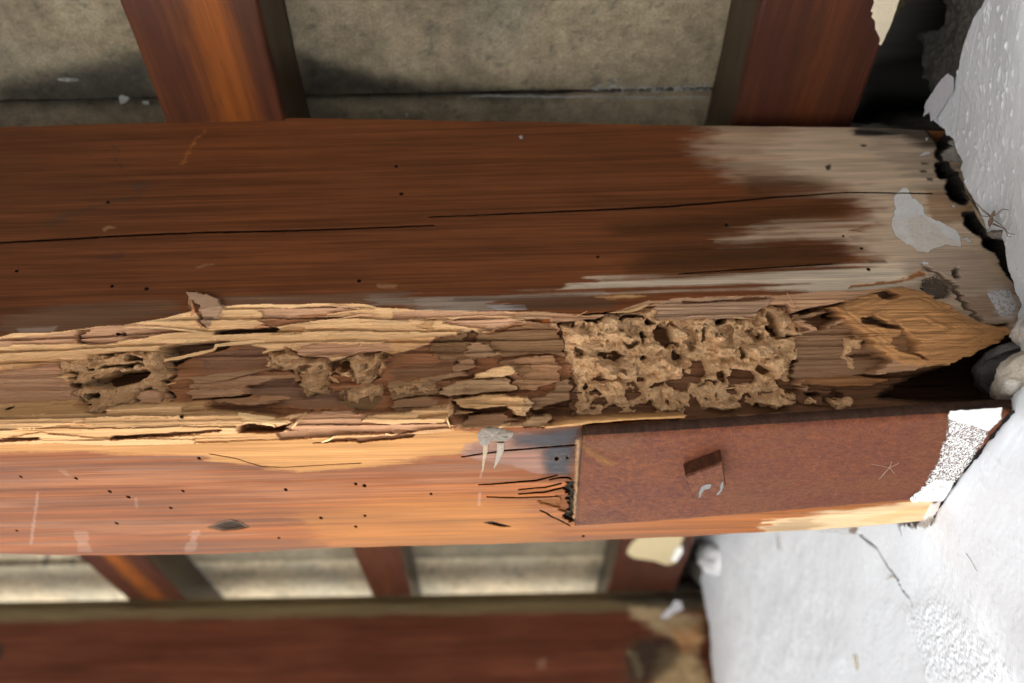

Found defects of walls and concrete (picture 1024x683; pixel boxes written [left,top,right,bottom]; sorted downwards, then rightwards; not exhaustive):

crack [0,192,933,243]
spalling [0,278,1024,445]
crack [479,475,571,526]